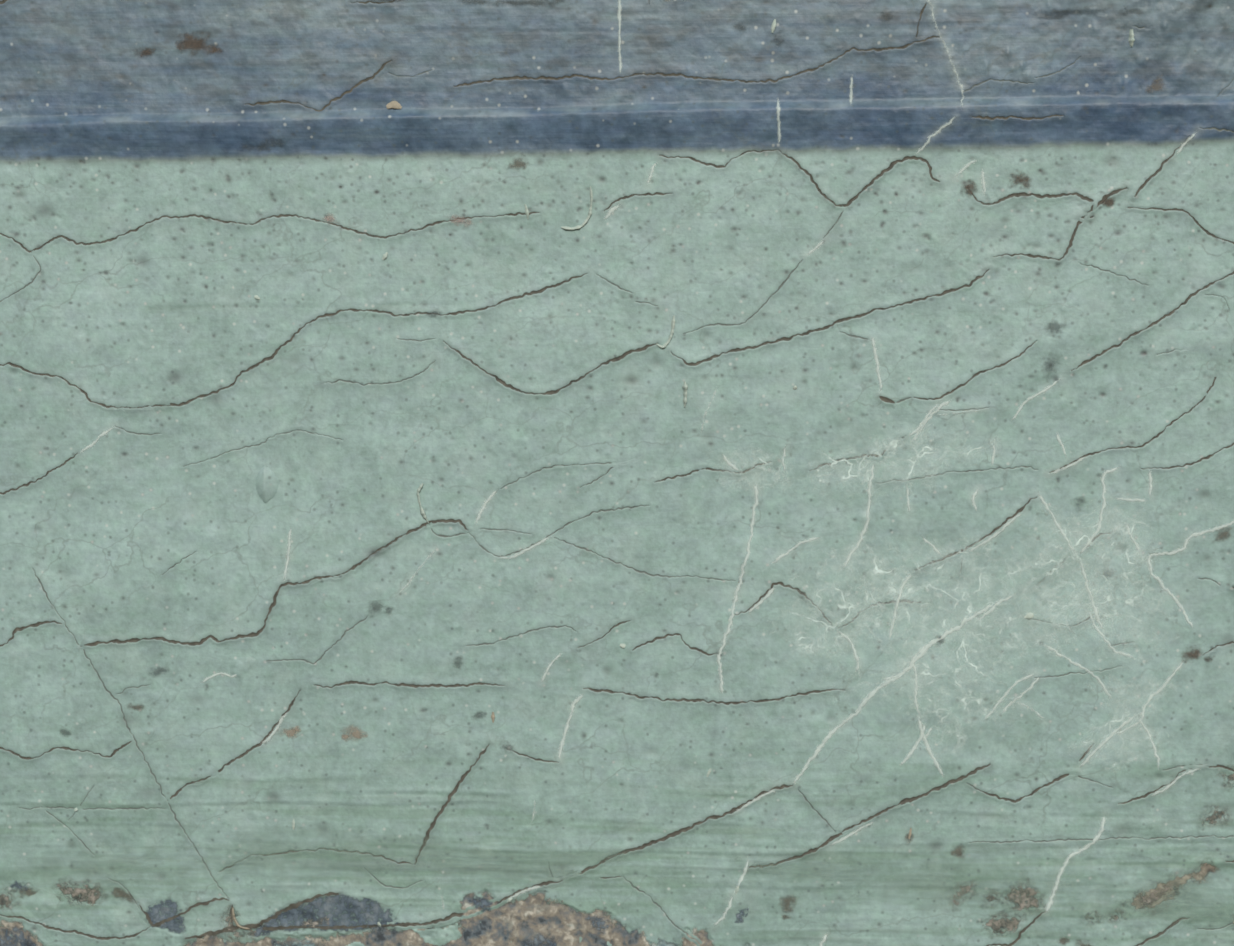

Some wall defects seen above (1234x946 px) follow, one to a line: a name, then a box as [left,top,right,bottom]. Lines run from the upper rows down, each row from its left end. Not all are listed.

crack [349,0,442,8]
crack [452,0,948,90]
crack [243,57,434,115]
crack [954,53,1084,124]
crack [0,208,541,306]
crack [395,117,1234,566]
crack [0,270,659,498]
crack [0,438,1234,946]
peeling [0,882,43,946]
peeling [57,883,101,904]
peeling [147,891,713,946]